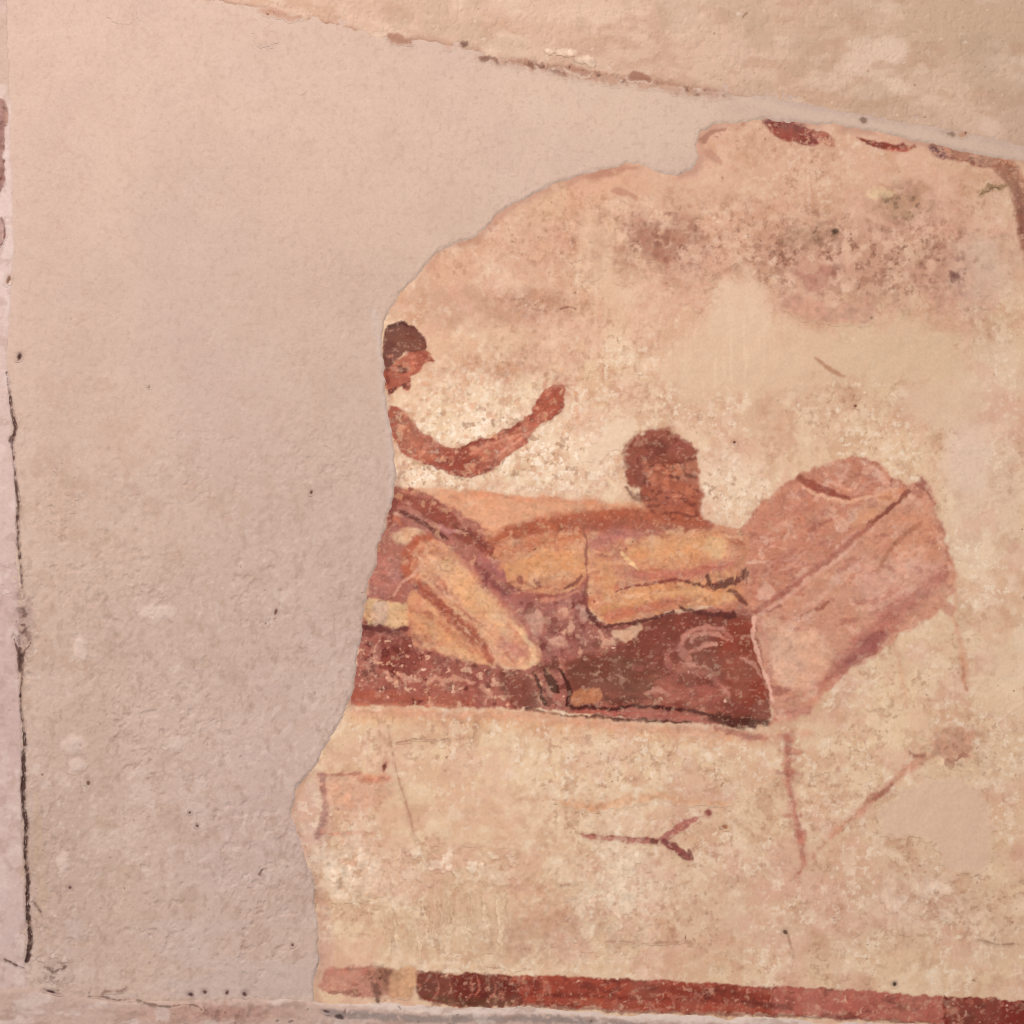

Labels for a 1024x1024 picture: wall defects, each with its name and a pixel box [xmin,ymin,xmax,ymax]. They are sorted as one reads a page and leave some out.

spalling [387,31,414,46]
spalling [457,39,732,102]
crack [6,371,25,591]
crack [2,636,36,969]